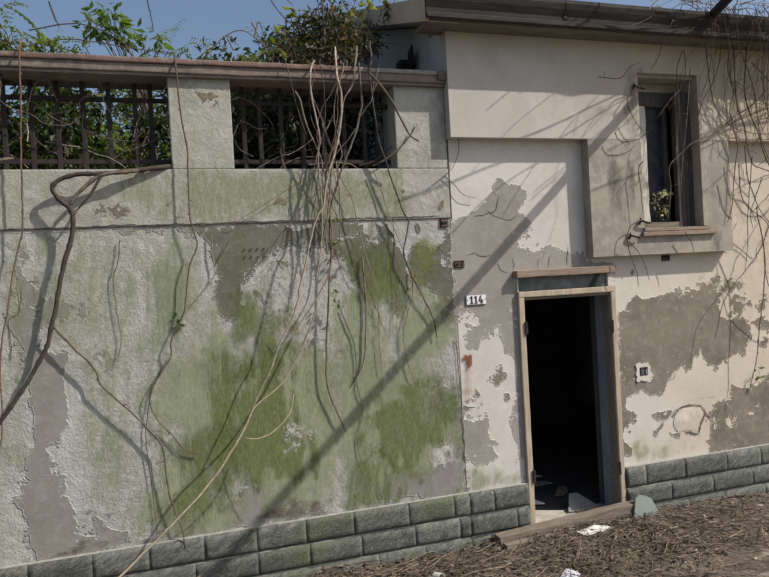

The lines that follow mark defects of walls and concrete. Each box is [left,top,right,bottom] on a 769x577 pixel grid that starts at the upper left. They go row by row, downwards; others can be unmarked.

peeling [3,243,131,561]
leakage [259,498,332,521]
peeling [92,177,634,464]
peeling [377,380,499,501]
leakage [428,440,459,468]
peeling [618,272,769,457]